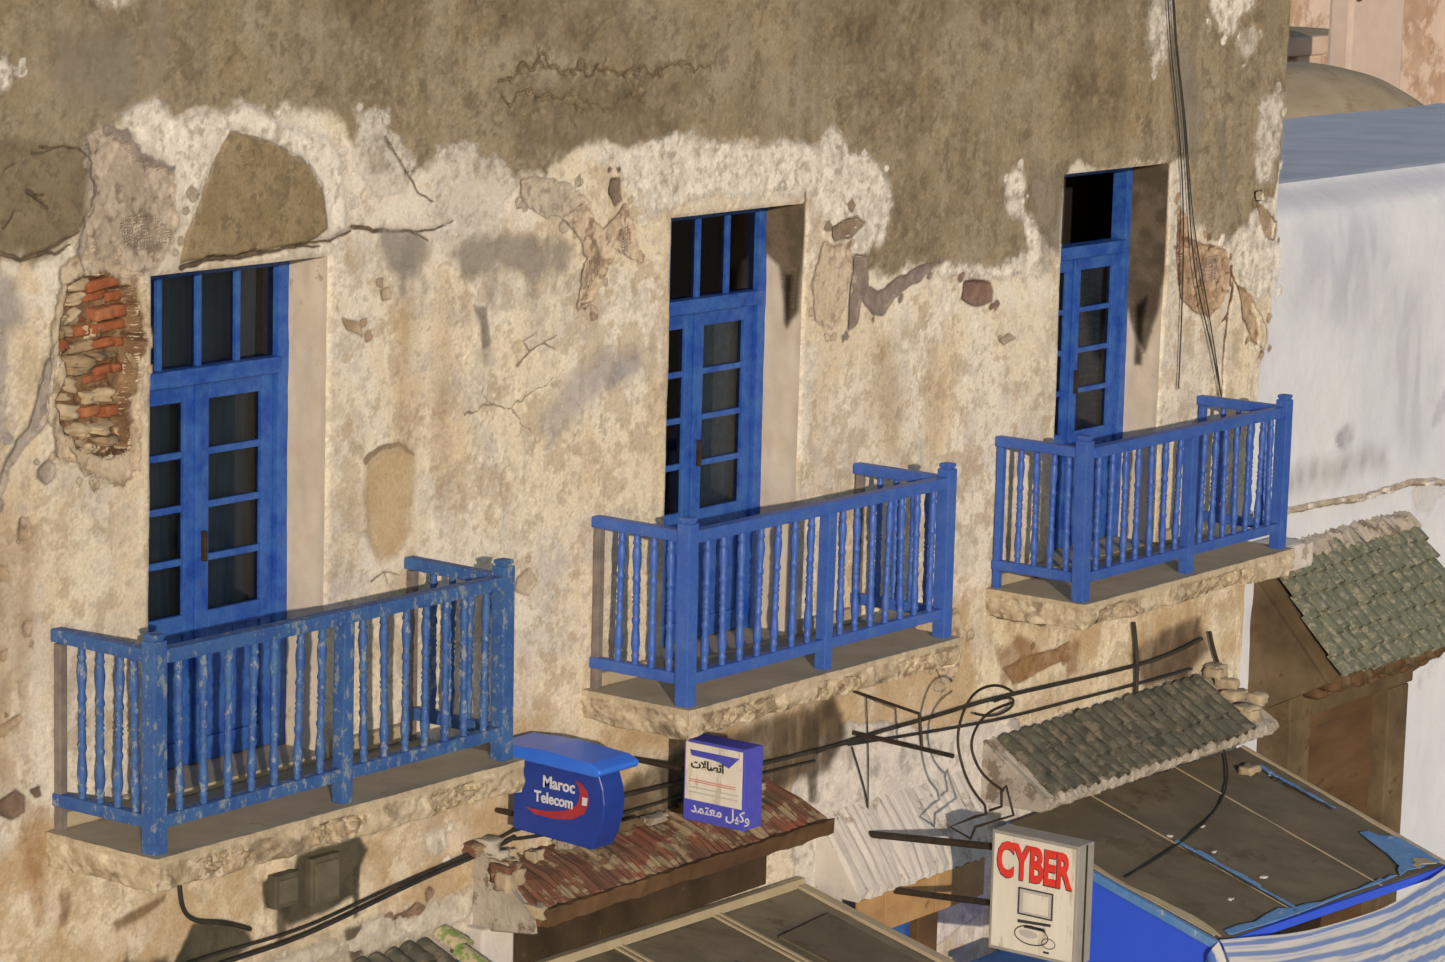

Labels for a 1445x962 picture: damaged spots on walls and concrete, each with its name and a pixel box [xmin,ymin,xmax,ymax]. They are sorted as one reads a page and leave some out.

peeling [0,58,28,90]
crack [179,136,453,271]
peeling [427,124,1057,342]
flaking render [1166,82,1287,365]
flaking render [0,98,416,512]
flaking render [17,516,33,544]
flaking render [364,442,414,559]